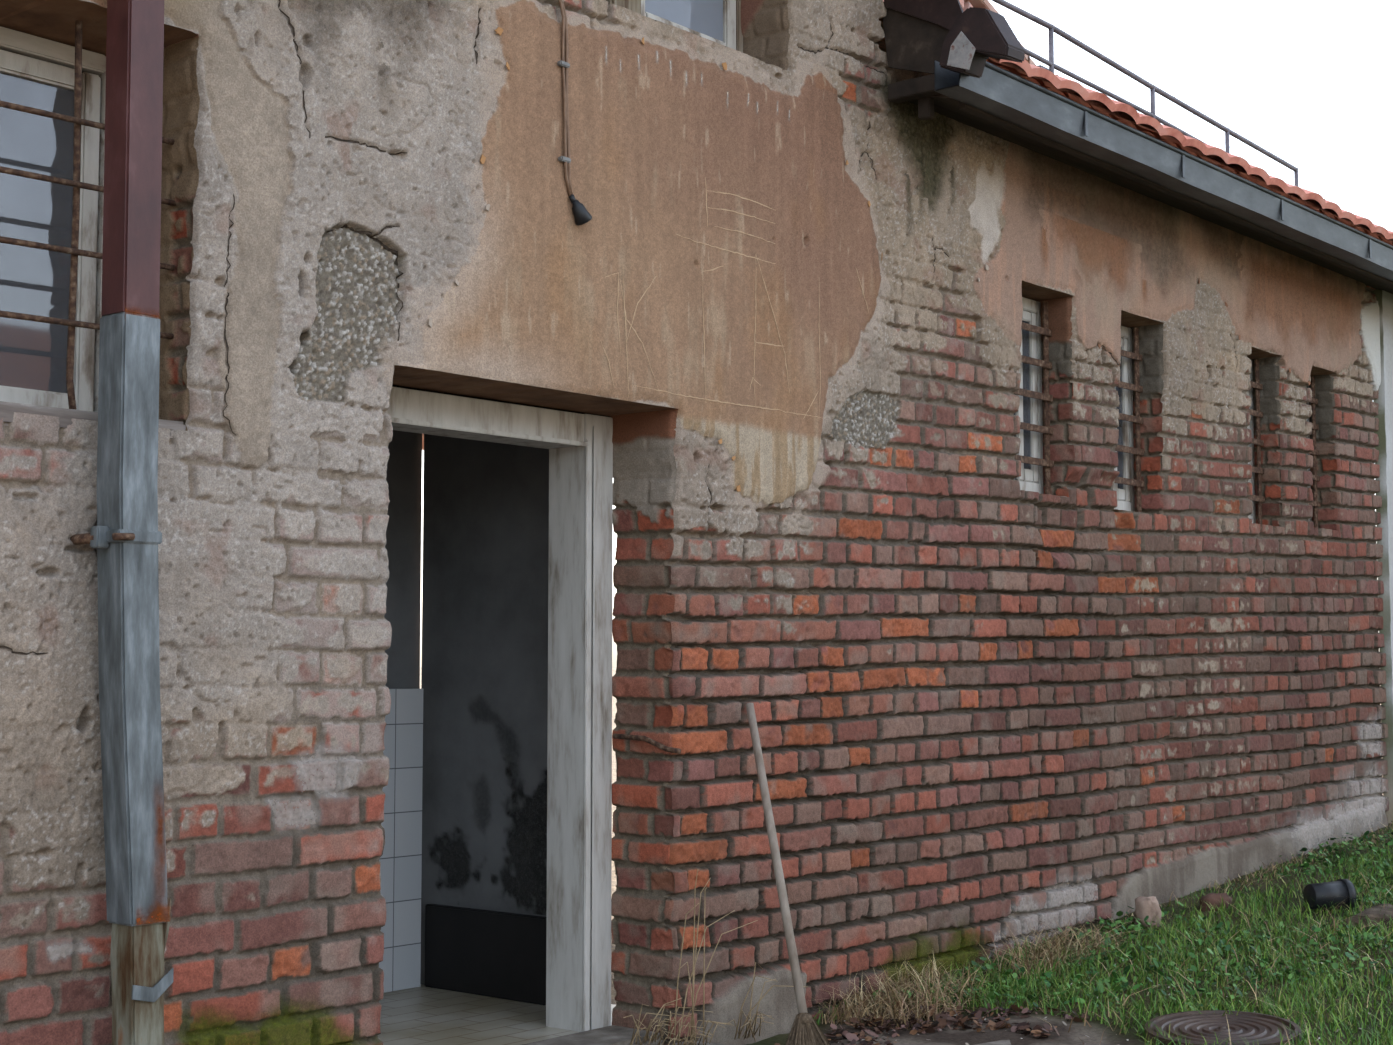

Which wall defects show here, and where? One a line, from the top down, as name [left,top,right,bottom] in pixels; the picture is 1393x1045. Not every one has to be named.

crack [278,0,407,155]
leakage [882,83,954,206]
flaking render [1163,277,1254,425]
flaking render [672,417,814,555]
spalling [1030,469,1141,570]
flaking render [0,475,103,816]
spalling [668,702,728,756]
spalling [675,644,739,671]
spalling [777,645,979,767]
leakage [430,768,547,915]
spalling [666,810,728,891]
rust [136,903,170,925]